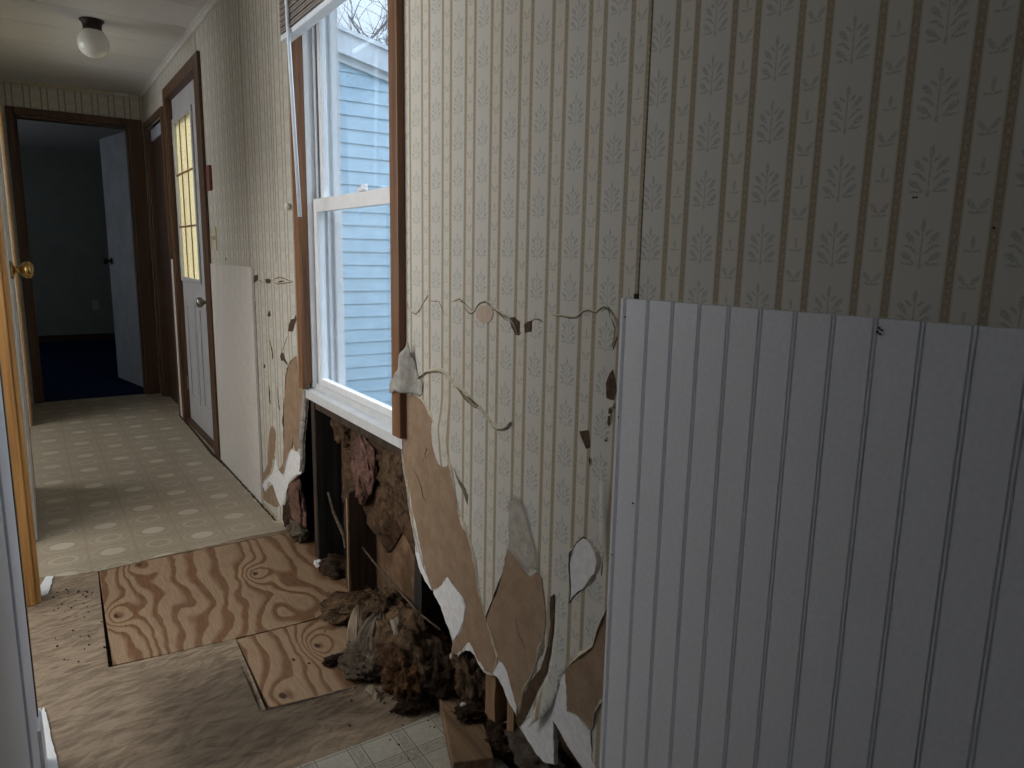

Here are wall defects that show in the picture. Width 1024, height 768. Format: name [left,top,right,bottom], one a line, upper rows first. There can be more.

peeling [389,342,423,397]
spalling [262,390,307,507]
spalling [400,445,517,713]
spalling [568,537,601,603]
spalling [521,673,596,768]